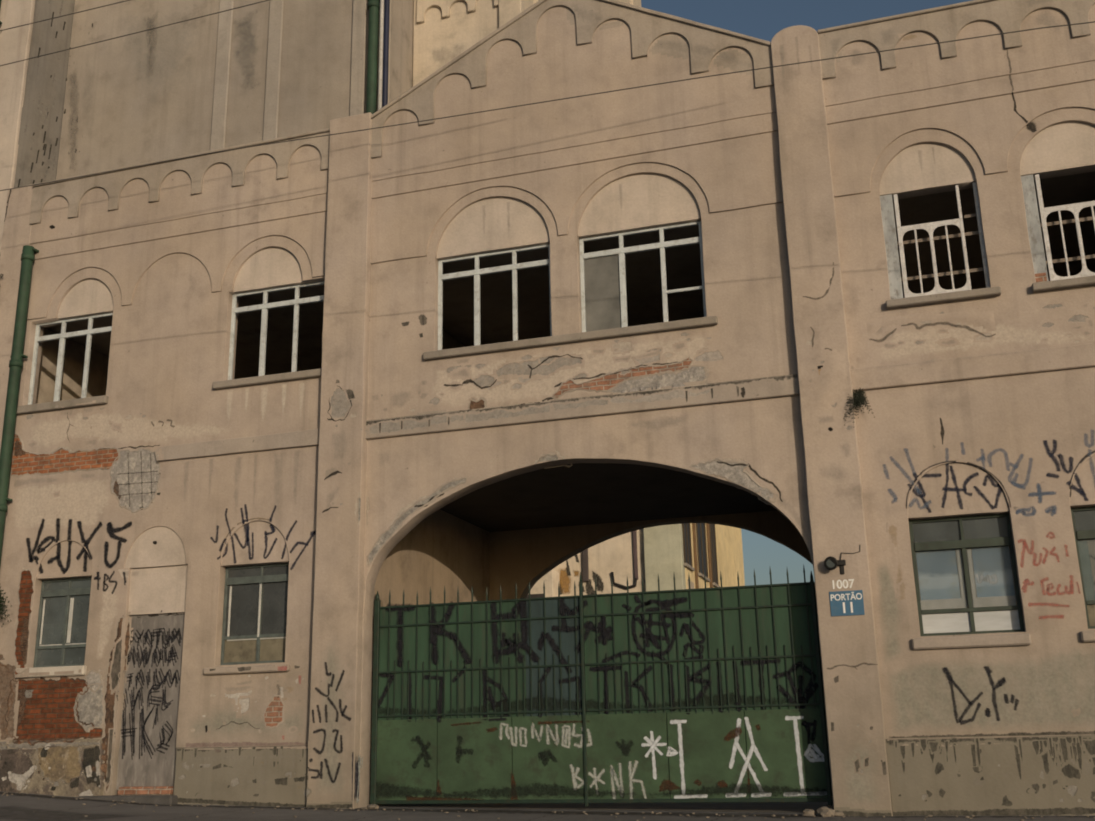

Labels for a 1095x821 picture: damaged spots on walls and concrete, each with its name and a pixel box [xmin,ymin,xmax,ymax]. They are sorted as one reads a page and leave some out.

crack [1007,51,1037,132]
peeling [367,331,727,436]
flaking render [10,430,165,521]
spalling [683,453,783,505]
flaking render [0,564,133,796]
flaking render [220,681,286,729]
leakage [829,520,1095,816]